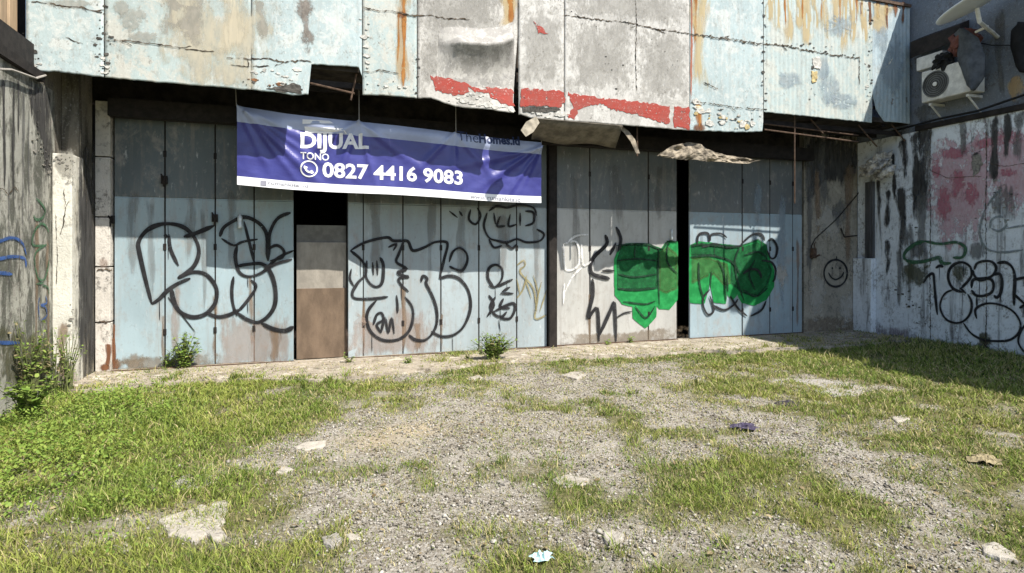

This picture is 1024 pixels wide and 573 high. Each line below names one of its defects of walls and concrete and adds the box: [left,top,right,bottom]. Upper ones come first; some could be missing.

peeling [243,67,303,94]
rust [396,0,408,86]
rust [501,0,515,25]
peeling [359,2,768,130]
rust [690,0,707,131]
rust [768,0,905,45]
water stain [2,80,32,220]
water stain [777,133,858,323]
water stain [876,97,931,303]
water stain [985,113,1024,180]
water stain [0,224,52,387]
rust [101,325,120,371]